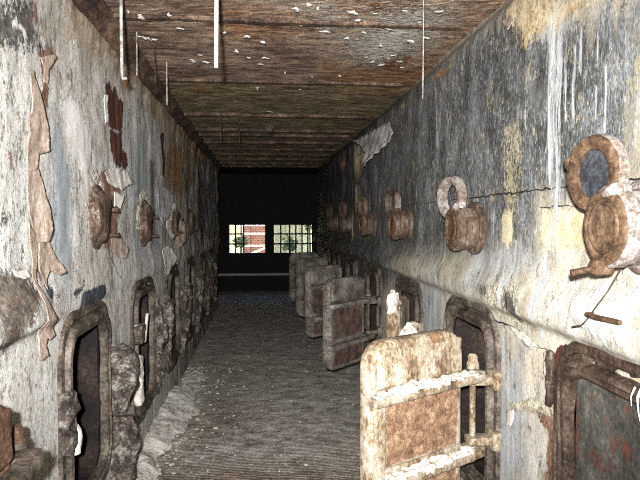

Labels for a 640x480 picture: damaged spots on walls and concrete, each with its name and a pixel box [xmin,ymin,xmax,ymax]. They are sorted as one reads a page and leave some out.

damp [595,66,607,132]
peeling [0,0,67,361]
peeling [340,121,395,241]
crack [450,186,577,209]
damp [528,0,582,338]
peeling [73,281,106,310]
damp [497,240,517,311]
crack [494,318,547,350]